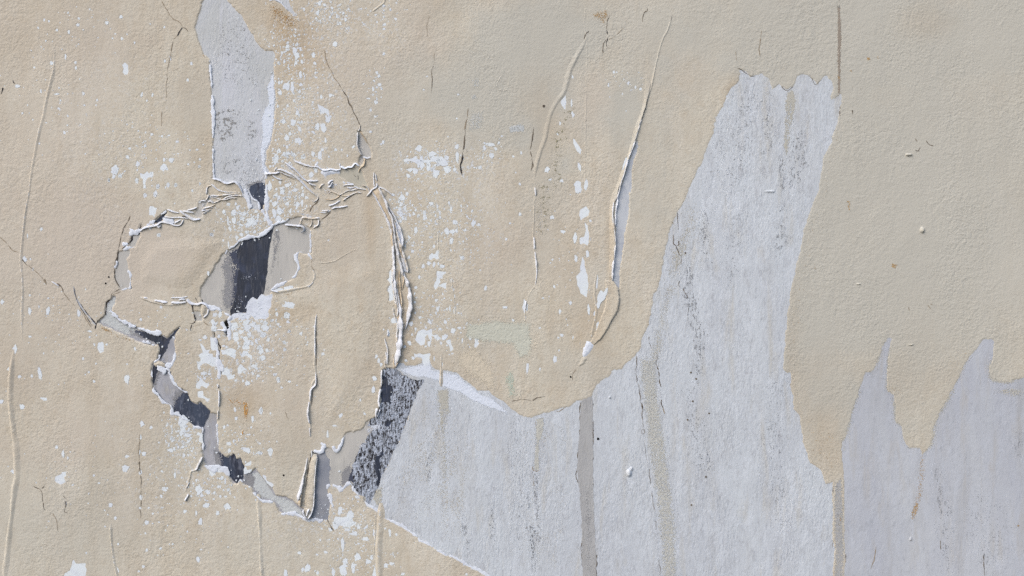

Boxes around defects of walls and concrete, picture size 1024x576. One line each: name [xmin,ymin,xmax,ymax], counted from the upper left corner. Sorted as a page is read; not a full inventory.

peeling [0,6,135,134]
crack [324,50,361,131]
crack [460,110,468,174]
peeling [0,281,86,354]
peeling [96,0,842,576]
peeling [83,330,108,383]
peeling [36,445,108,516]
peeling [841,338,1024,576]
peeling [64,552,87,576]